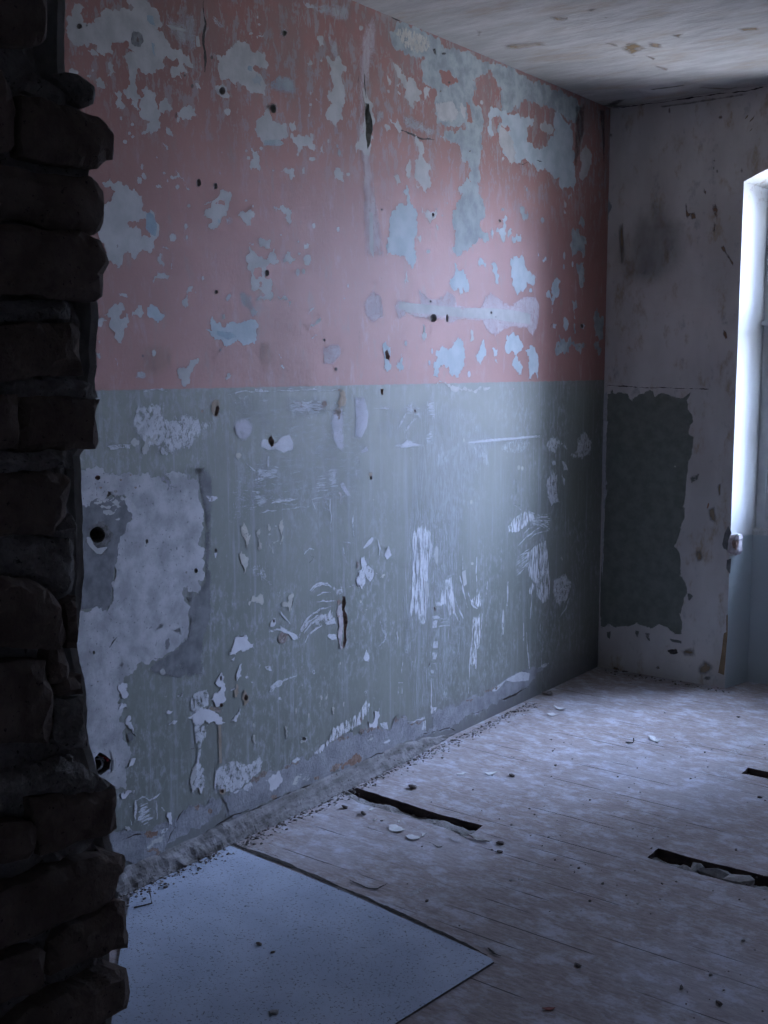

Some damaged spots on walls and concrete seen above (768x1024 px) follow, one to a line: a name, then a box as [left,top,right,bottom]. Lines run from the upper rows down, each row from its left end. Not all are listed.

peeling [66,0,201,158]
peeling [98,164,255,283]
peeling [208,234,311,351]
peeling [355,21,592,295]
peeling [108,400,220,455]
peeling [600,390,699,643]
flaking render [77,465,217,799]
flaking render [109,635,551,864]